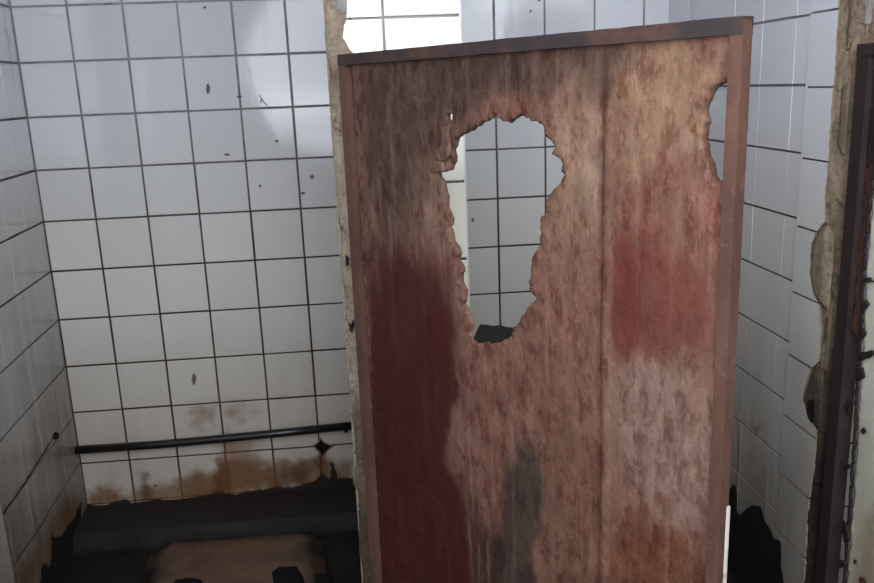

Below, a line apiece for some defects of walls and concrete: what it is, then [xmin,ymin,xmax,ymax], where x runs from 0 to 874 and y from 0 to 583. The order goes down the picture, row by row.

water stain [41,502,94,583]
water stain [188,463,353,499]
flaking render [325,0,372,583]
flaking render [803,0,874,583]